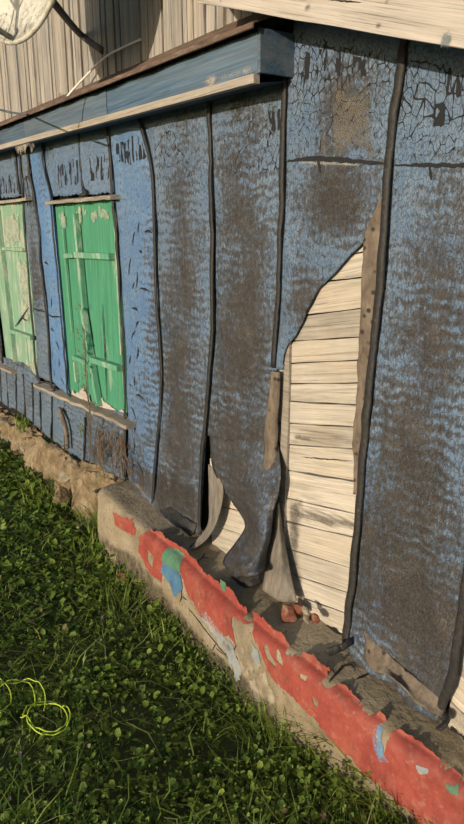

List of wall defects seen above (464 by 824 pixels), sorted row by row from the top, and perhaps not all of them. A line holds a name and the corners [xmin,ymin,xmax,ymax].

crack [154,80,392,181]
crack [406,133,464,161]
peeling [113,513,464,824]